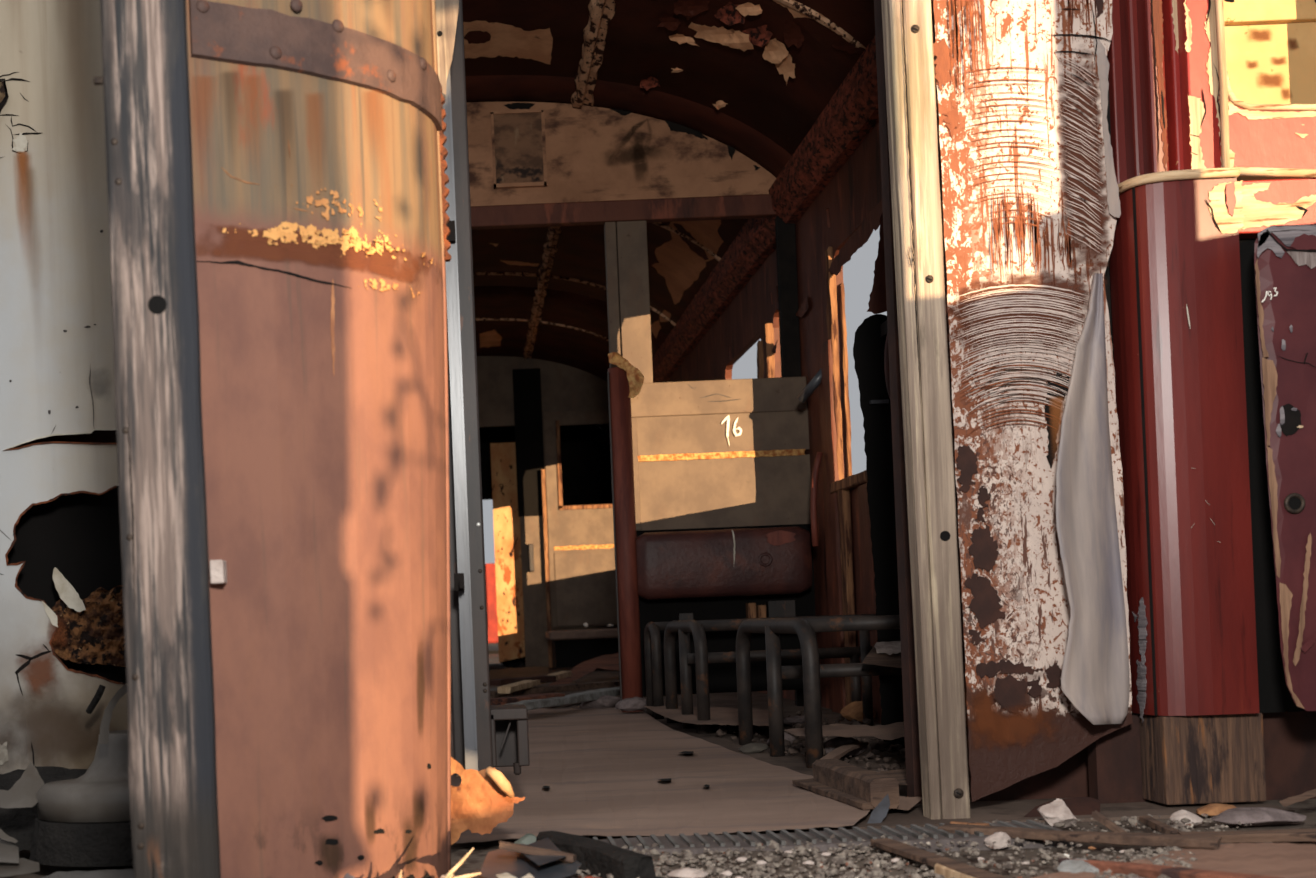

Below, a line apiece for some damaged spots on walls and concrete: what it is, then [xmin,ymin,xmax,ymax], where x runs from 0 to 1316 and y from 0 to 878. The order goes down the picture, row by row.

peeling [463,20,553,65]
peeling [657,0,825,85]
peeling [933,38,955,91]
peeling [0,72,41,158]
peeling [943,107,960,137]
peeling [1151,0,1316,234]
rust [19,152,28,200]
rust [212,187,435,298]
spalling [1276,404,1304,437]
peeling [975,273,1148,725]
peeling [956,443,1005,646]
peeling [1293,533,1312,666]